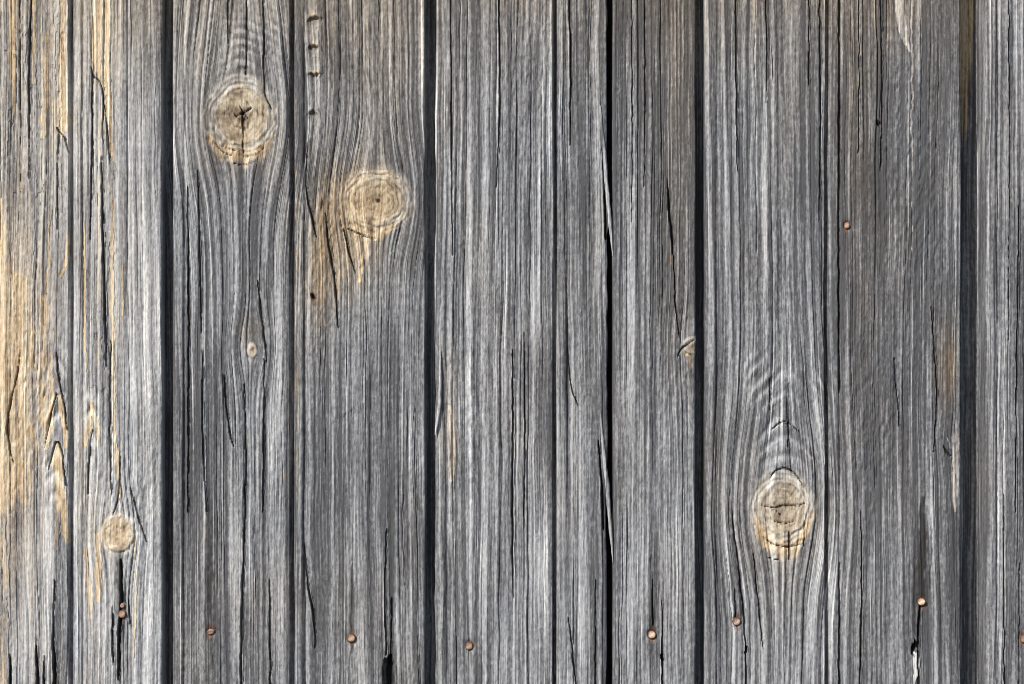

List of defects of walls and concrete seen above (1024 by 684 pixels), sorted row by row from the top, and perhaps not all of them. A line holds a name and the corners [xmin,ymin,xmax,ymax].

crack [44,69,147,542]
crack [305,143,371,328]
crack [601,0,694,355]
crack [5,352,21,460]
crack [187,176,272,684]
crack [597,441,605,529]
crack [915,605,923,684]